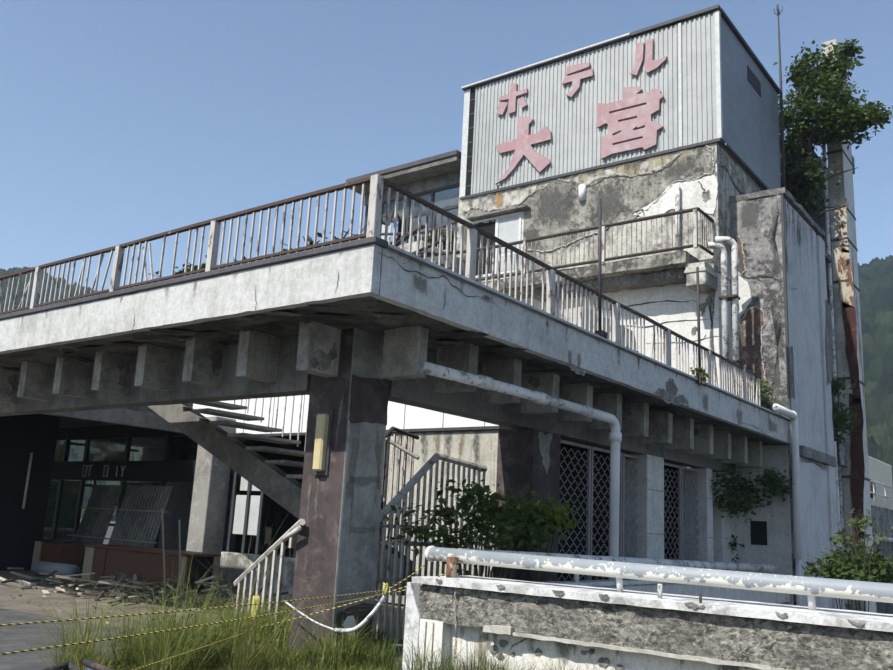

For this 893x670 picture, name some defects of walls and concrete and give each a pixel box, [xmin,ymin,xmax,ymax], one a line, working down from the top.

crack [588,149,688,187]
spalling [459,141,726,260]
crack [380,253,502,310]
spalling [730,231,747,276]
spalling [739,303,766,392]
peeling [648,378,689,415]
rust [838,196,865,560]
spalling [581,648,624,670]